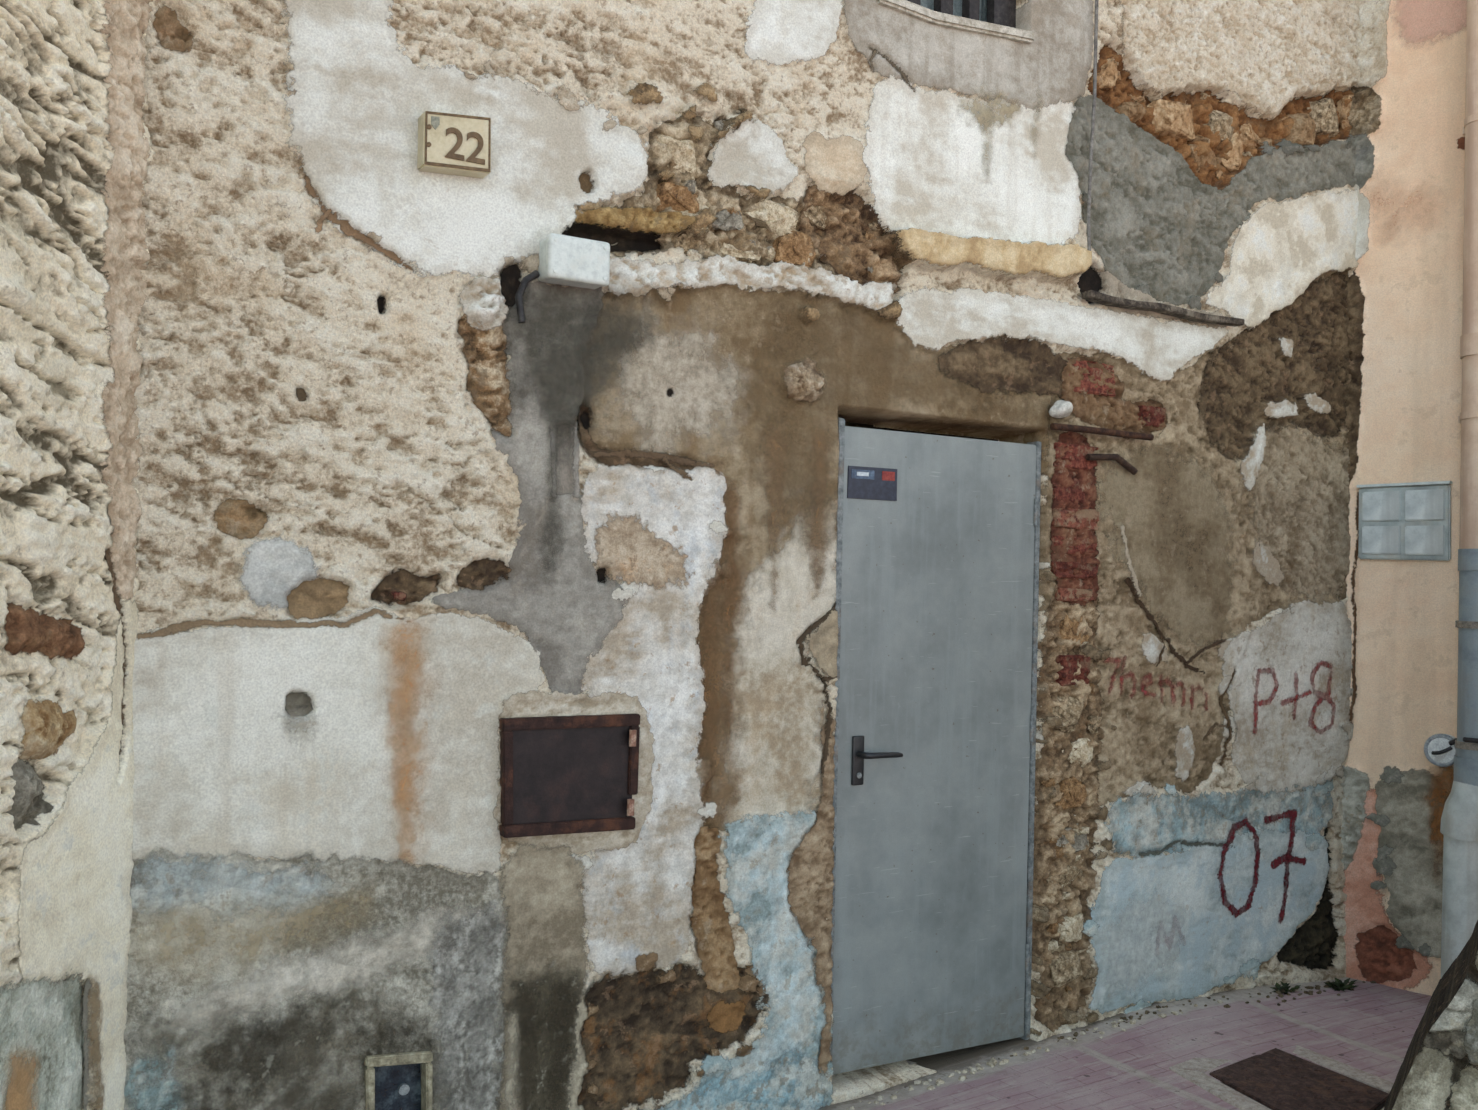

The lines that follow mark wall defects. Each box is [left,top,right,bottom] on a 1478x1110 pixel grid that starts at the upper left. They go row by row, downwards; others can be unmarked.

flaking render [1088,45,1355,190]
damp [508,285,1008,588]
flaking render [6,699,77,830]
flaking render [4,602,85,660]
crack [105,549,410,755]
damp [699,488,743,820]
spalling [562,82,1433,1110]
crack [1120,525,1236,766]
crack [1139,840,1235,856]
damp [124,844,589,1110]